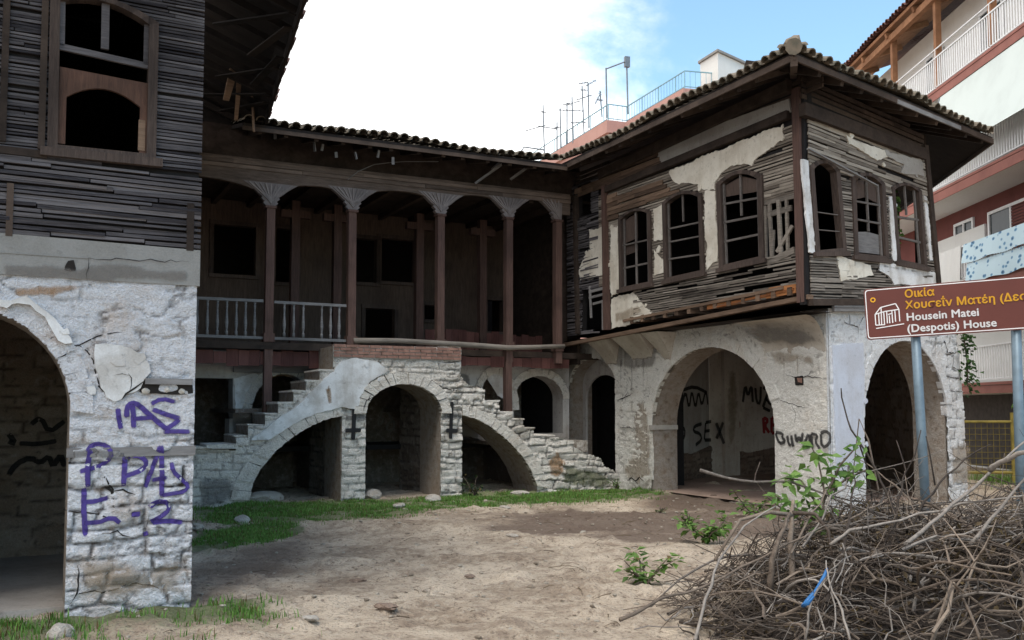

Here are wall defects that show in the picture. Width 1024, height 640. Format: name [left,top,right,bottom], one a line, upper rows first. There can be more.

peeling [658,99,791,270]
peeling [800,159,815,253]
peeling [845,133,924,178]
peeling [835,195,936,285]
crack [86,258,187,282]
peeling [0,295,72,344]
peeling [86,343,193,402]